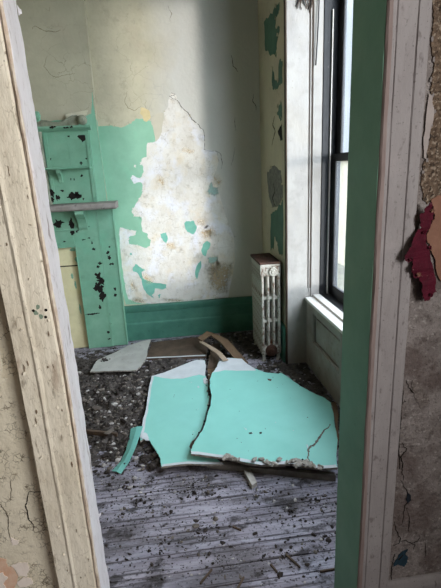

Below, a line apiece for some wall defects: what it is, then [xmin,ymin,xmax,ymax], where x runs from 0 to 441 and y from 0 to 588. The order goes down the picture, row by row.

peeling [262,2,283,90]
peeling [275,100,283,141]
flaking render [404,0,441,301]
flaking render [49,93,235,305]
peeling [266,165,284,255]
peeling [87,261,106,315]
crack [391,380,426,580]